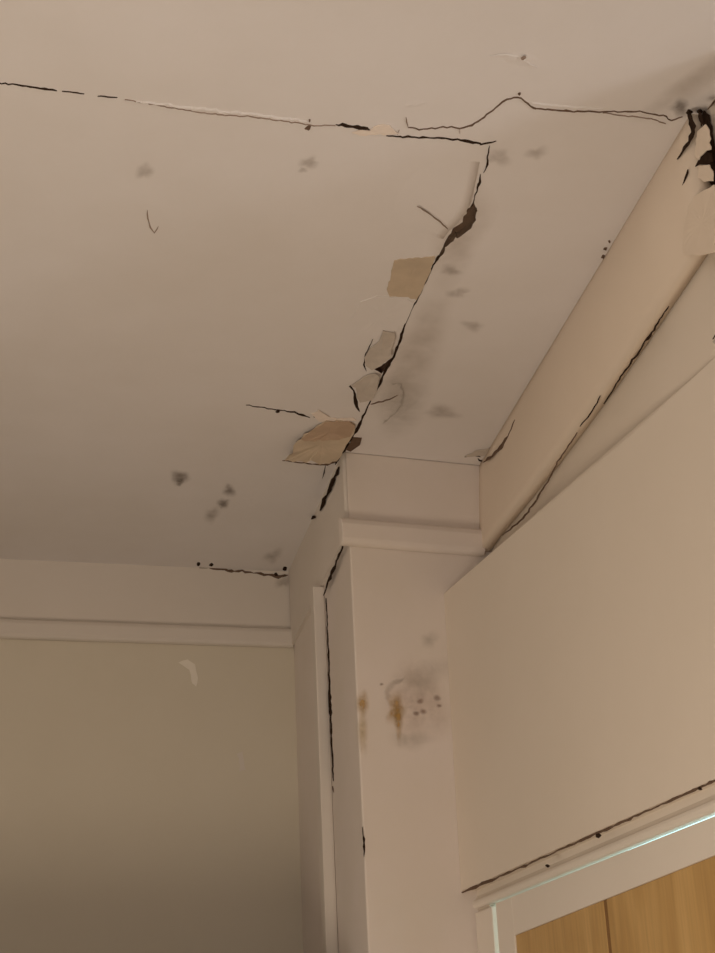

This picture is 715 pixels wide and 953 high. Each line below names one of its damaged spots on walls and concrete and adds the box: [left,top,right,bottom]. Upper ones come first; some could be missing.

spalling [677,109,715,185]
crack [0,82,683,536]
peeling [285,420,355,465]
crack [461,780,715,893]